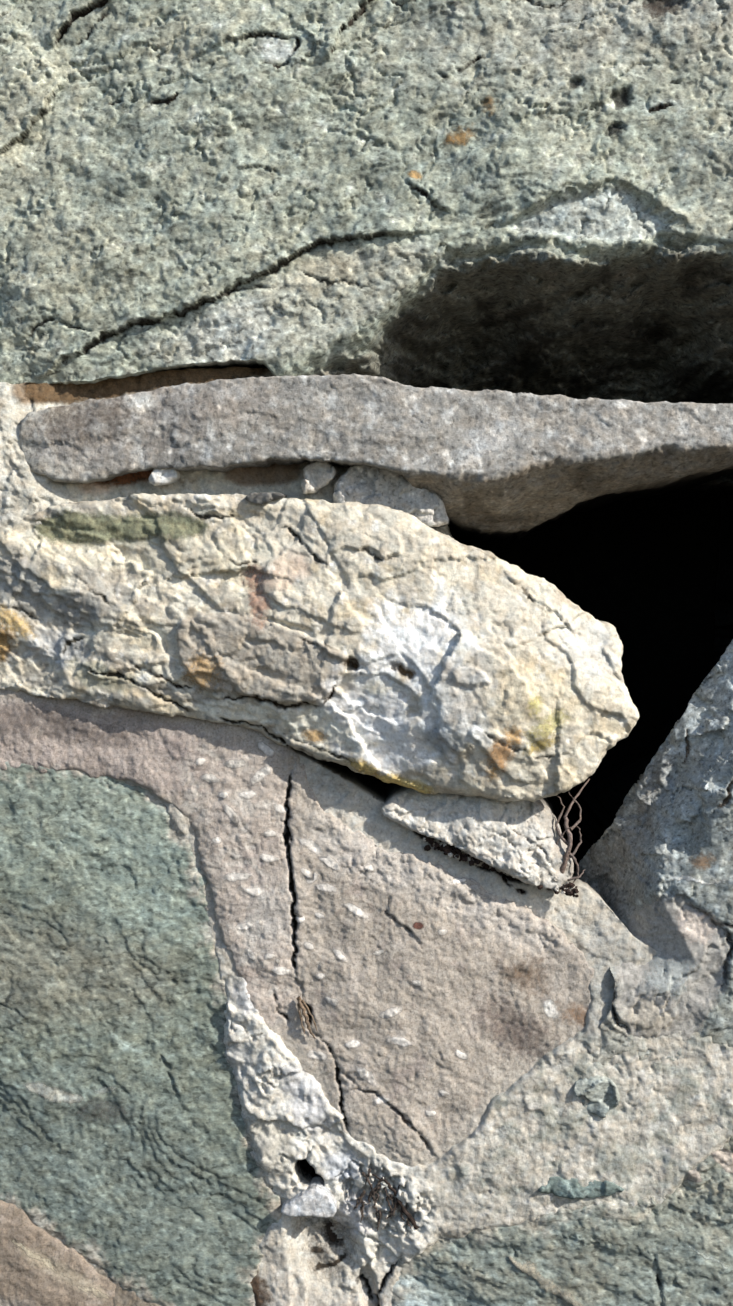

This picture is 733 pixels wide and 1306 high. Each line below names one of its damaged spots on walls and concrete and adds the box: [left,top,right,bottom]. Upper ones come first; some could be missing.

crack [63,637,83,653]
crack [91,665,191,712]
crack [222,685,353,968]
crack [275,995,428,1146]